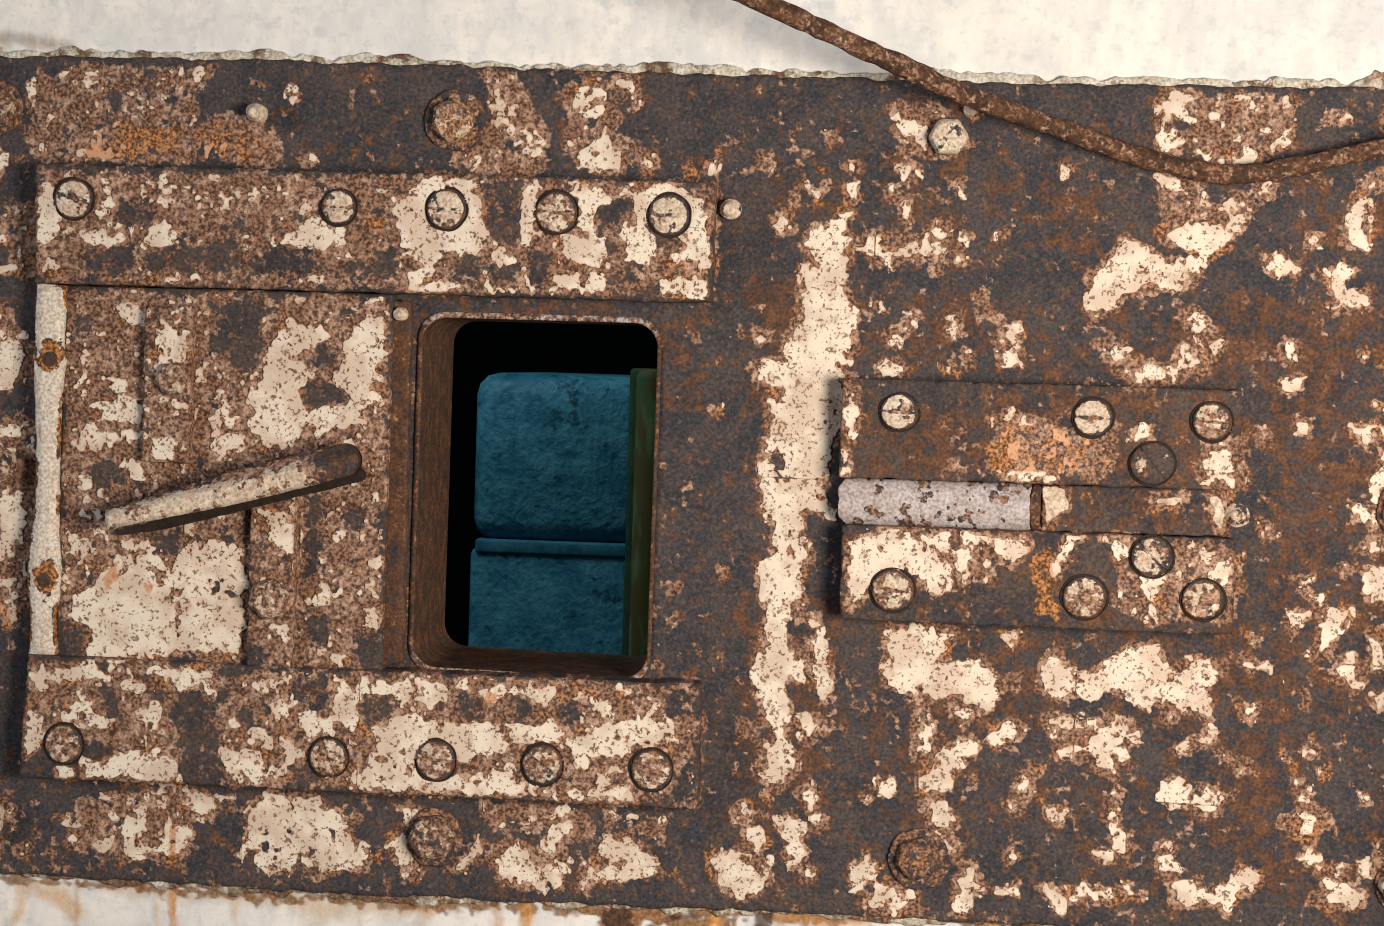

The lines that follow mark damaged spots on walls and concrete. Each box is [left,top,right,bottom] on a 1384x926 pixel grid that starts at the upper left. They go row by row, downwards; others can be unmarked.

peeling [0,65,354,274]
peeling [376,71,711,300]
peeling [1083,172,1272,318]
peeling [1154,90,1297,165]
peeling [24,267,693,896]
peeling [710,162,972,900]
peeling [847,528,1030,603]
peeling [1285,402,1384,658]
peeling [878,622,1027,855]
peeling [1040,644,1226,865]
corrosion [0,875,860,926]
peeling [1157,841,1260,914]